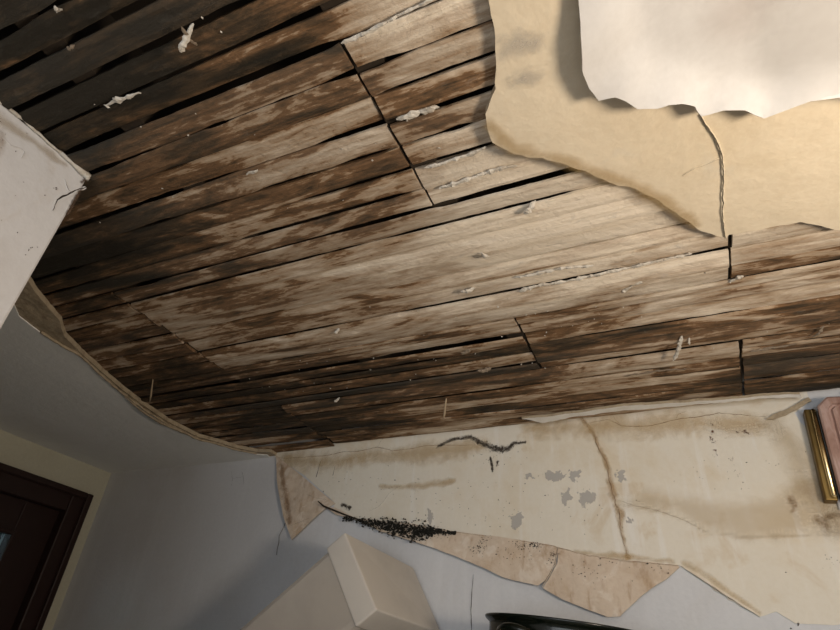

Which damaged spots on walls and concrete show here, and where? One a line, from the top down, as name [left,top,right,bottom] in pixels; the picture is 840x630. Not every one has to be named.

crack [51,179,86,211]
flaking render [485,0,840,238]
crack [682,115,726,238]
damp [438,435,526,472]
peeling [274,391,840,625]
crack [582,412,767,558]